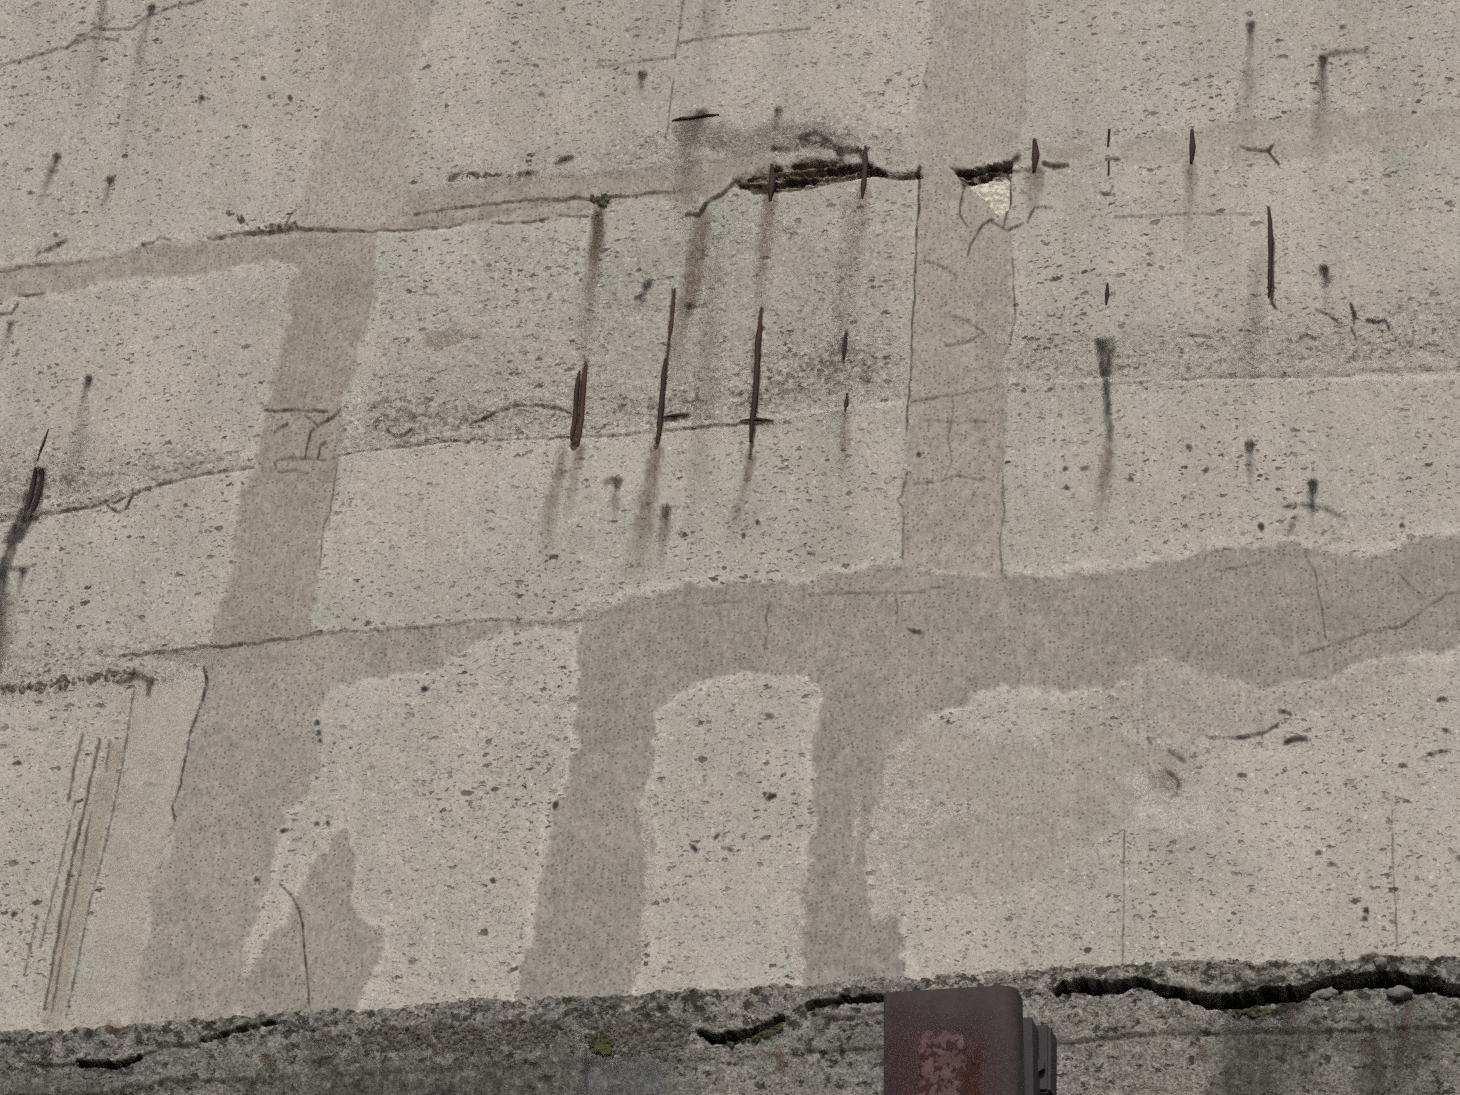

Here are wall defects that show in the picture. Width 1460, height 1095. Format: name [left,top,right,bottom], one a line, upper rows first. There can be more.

crack [207,180,738,239]
spalling [672,114,876,201]
spalling [951,138,1040,215]
crack [0,263,52,314]
leakage [0,471,42,595]
leakage [1124,775,1216,835]
crack [695,993,884,1050]
crack [1056,951,1459,1022]